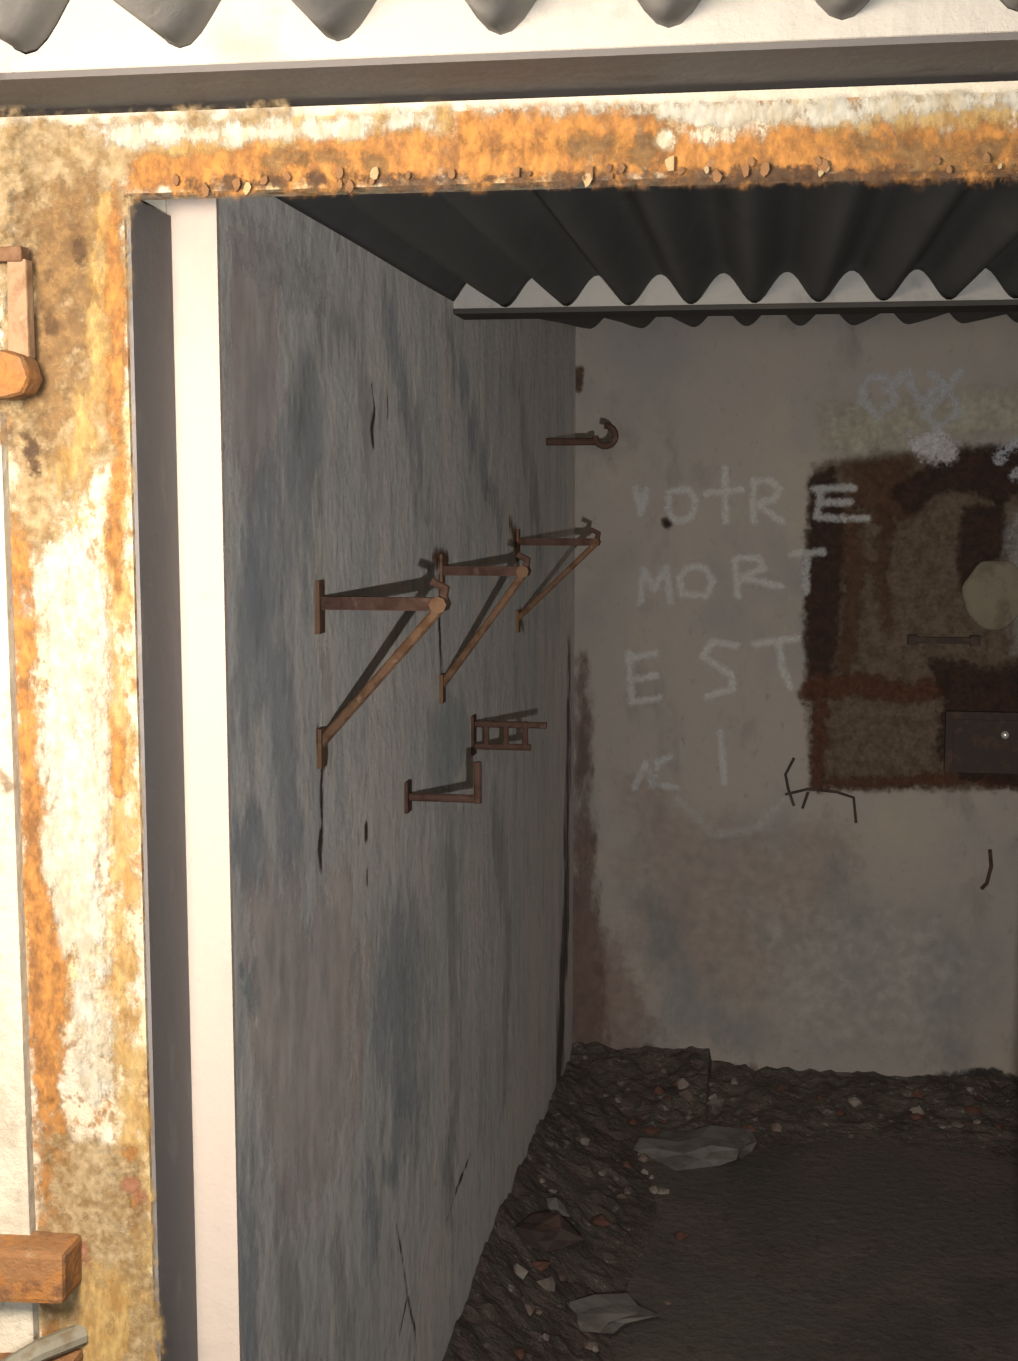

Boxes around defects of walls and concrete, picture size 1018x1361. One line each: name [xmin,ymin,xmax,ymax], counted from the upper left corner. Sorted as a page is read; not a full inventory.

corrosion [0,96,1018,628]
corrosion [10,511,161,1361]
corrosion [317,726,328,872]